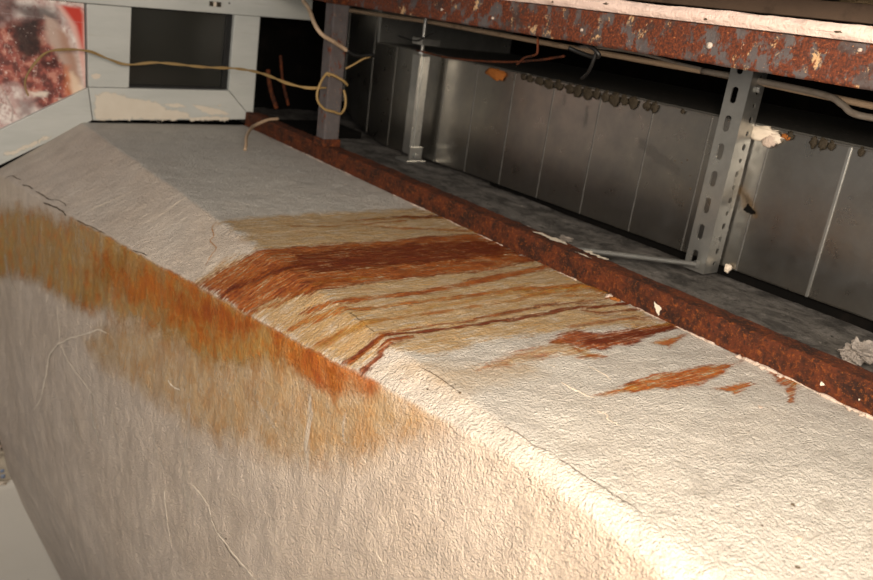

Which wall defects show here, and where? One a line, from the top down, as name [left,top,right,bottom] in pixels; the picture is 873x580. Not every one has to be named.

peeling [94,91,230,122]
crack [11,175,105,234]
corrosion [200,209,684,376]
corrosion [600,364,733,395]
corrosion [720,382,754,394]
corrosion [768,372,797,403]